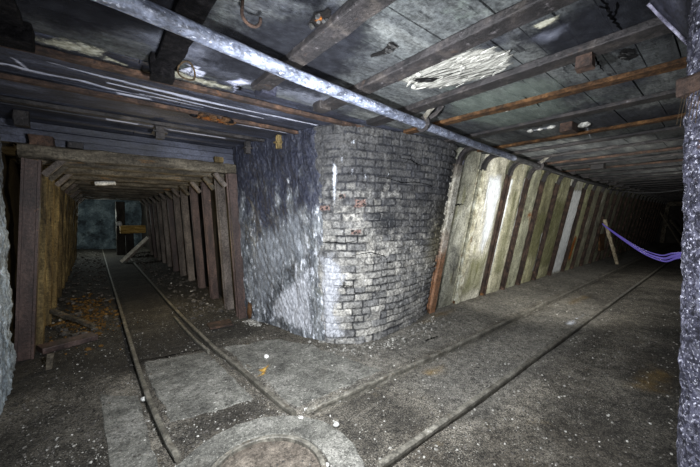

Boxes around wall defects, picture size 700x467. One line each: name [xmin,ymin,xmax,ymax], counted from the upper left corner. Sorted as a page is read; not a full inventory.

crack [599,0,622,30]
rust [189,113,236,125]